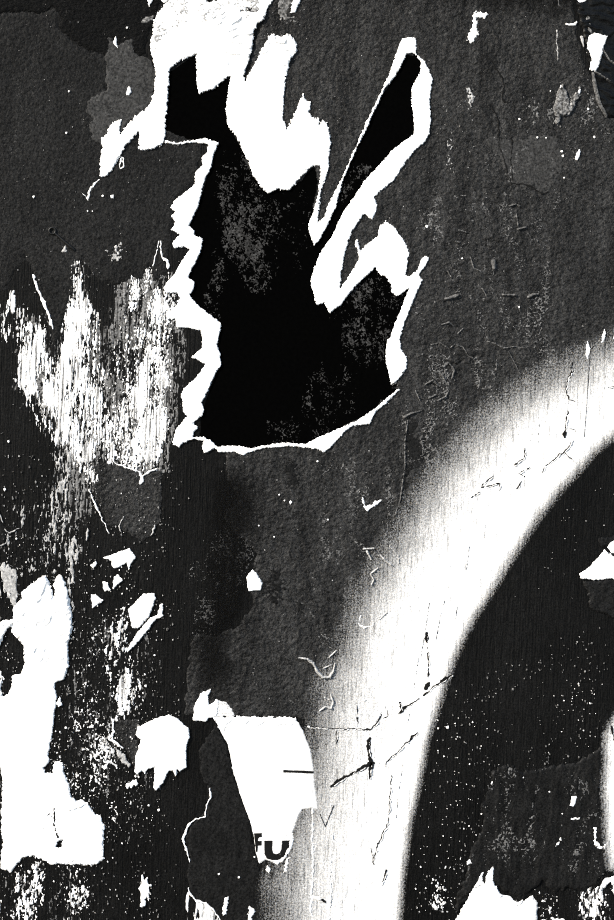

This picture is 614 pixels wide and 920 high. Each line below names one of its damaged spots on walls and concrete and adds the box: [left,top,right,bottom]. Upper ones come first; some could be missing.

crack [471,349,614,498]
peeling [0,261,178,920]
crack [300,586,457,886]